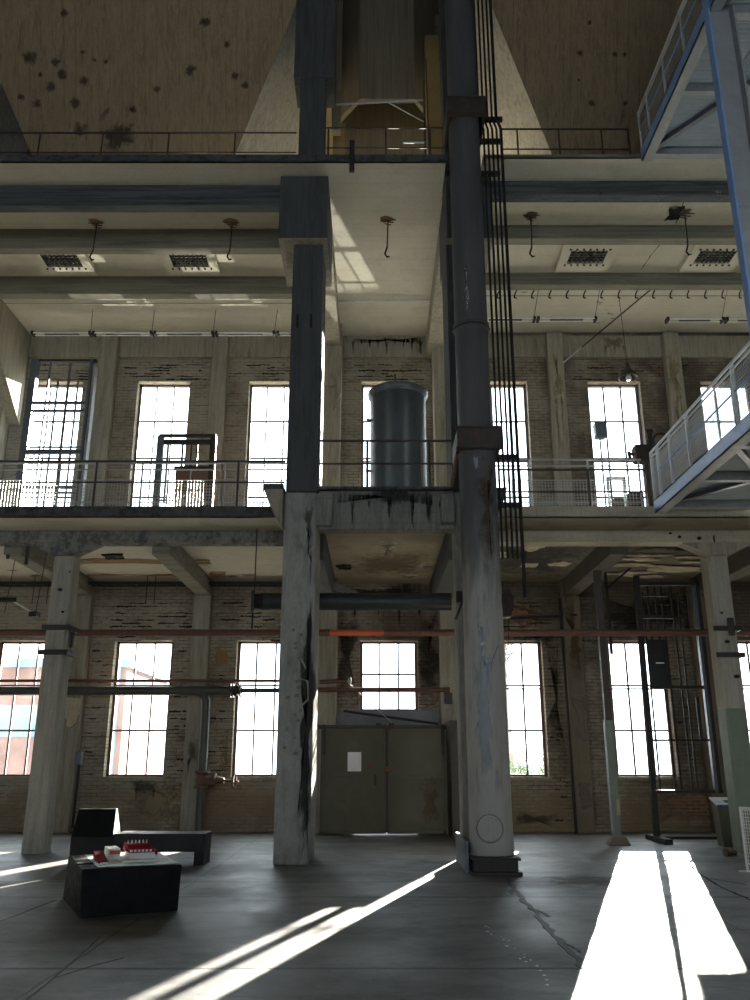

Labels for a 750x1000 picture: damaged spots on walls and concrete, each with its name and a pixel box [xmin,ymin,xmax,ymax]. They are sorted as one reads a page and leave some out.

damp [352,338,422,354]
damp [338,491,440,523]
peeling [520,546,572,568]
flaking render [603,532,701,579]
crack [505,877,628,1000]